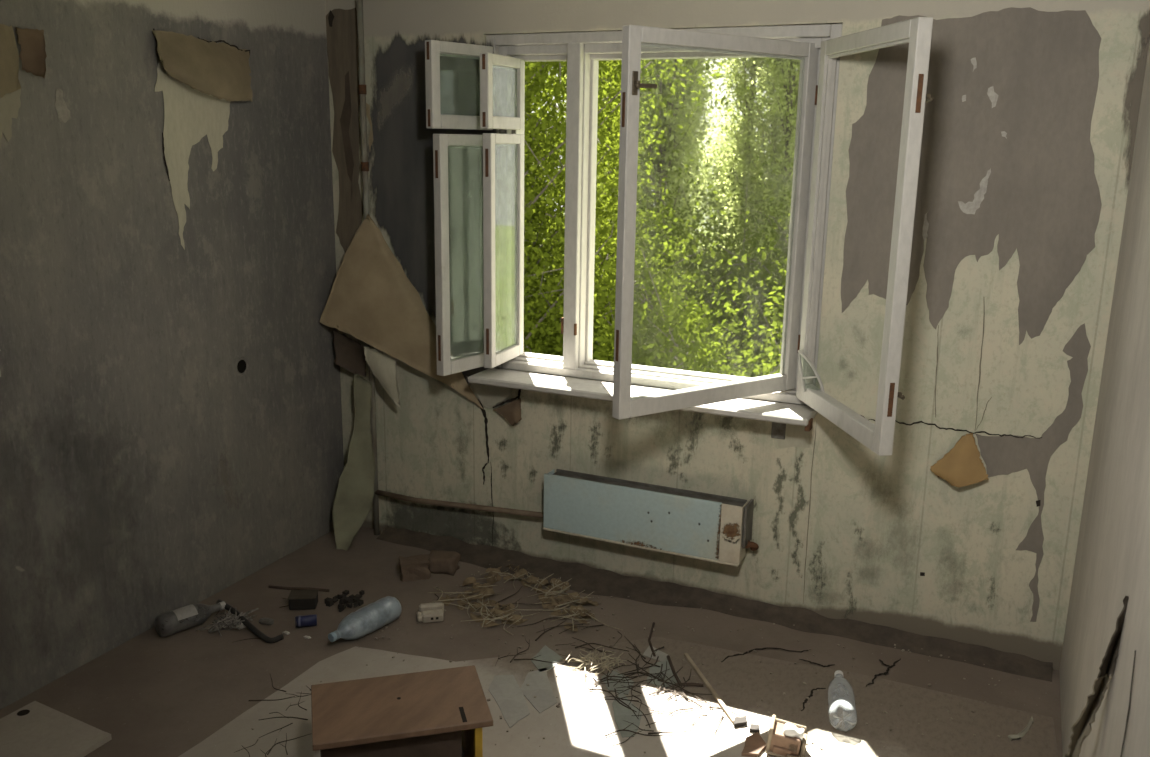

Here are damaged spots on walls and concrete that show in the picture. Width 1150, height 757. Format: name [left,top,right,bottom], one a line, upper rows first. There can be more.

peeling [154,57,231,250]
flaking render [841,43,909,313]
flaking render [881,7,1102,345]
damp [388,499,520,549]
crack [462,373,494,546]
damp [551,424,566,457]
damp [669,414,701,478]
damp [773,454,826,587]
crack [861,305,1042,439]
flaking render [975,323,1091,622]